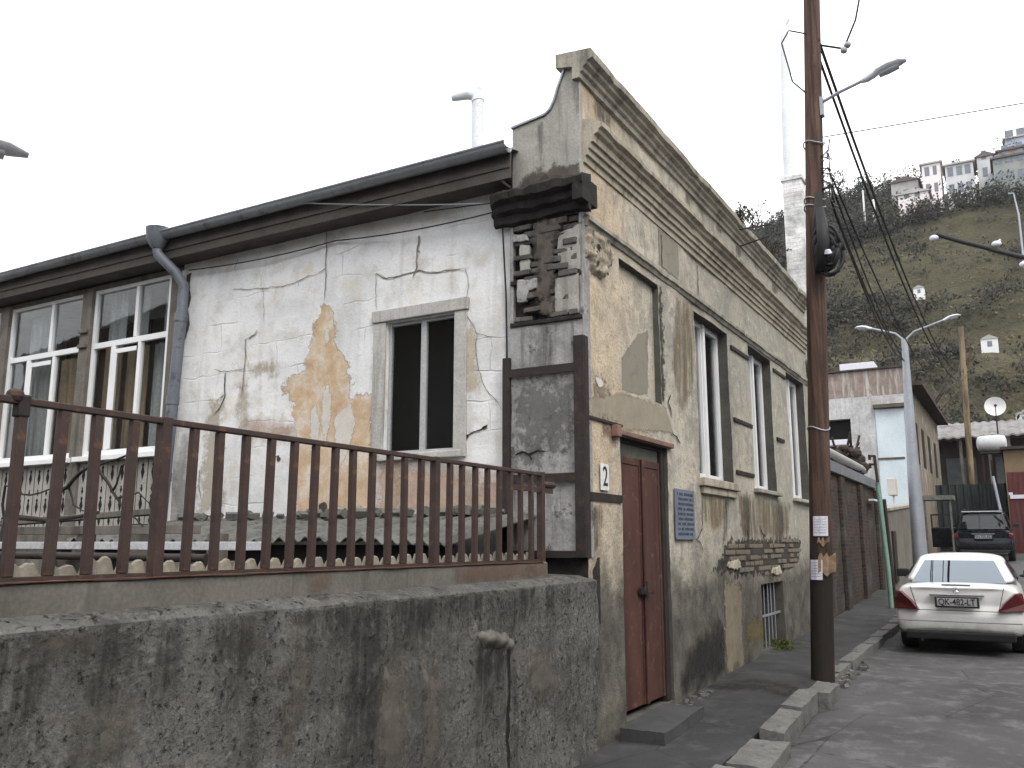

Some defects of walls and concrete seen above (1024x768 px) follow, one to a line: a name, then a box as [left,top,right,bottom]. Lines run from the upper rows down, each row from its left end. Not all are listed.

crack [214,231,327,414]
peeling [280,303,372,512]
crack [375,236,502,437]
spalling [510,215,583,328]
leakage [684,622,797,695]
flaking render [713,535,802,673]